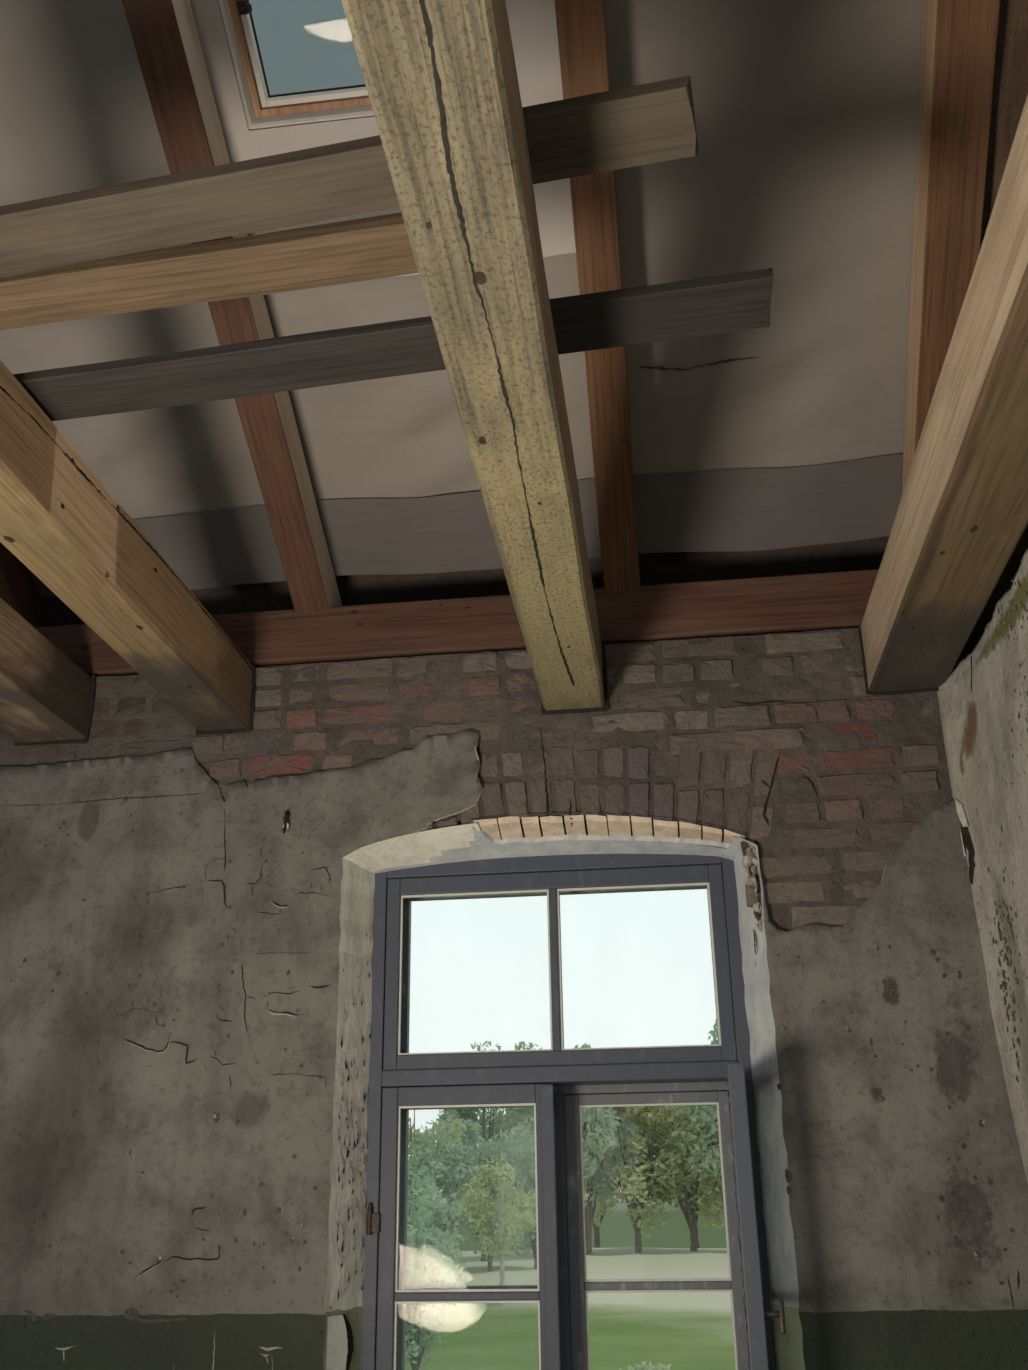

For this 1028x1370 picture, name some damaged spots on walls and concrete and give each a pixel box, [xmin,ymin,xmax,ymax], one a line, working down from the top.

crack [419,0,575,685]
crack [6,776,330,1087]
flaking render [0,655,436,801]
flaking render [472,628,1022,1083]
crack [134,1207,220,1280]